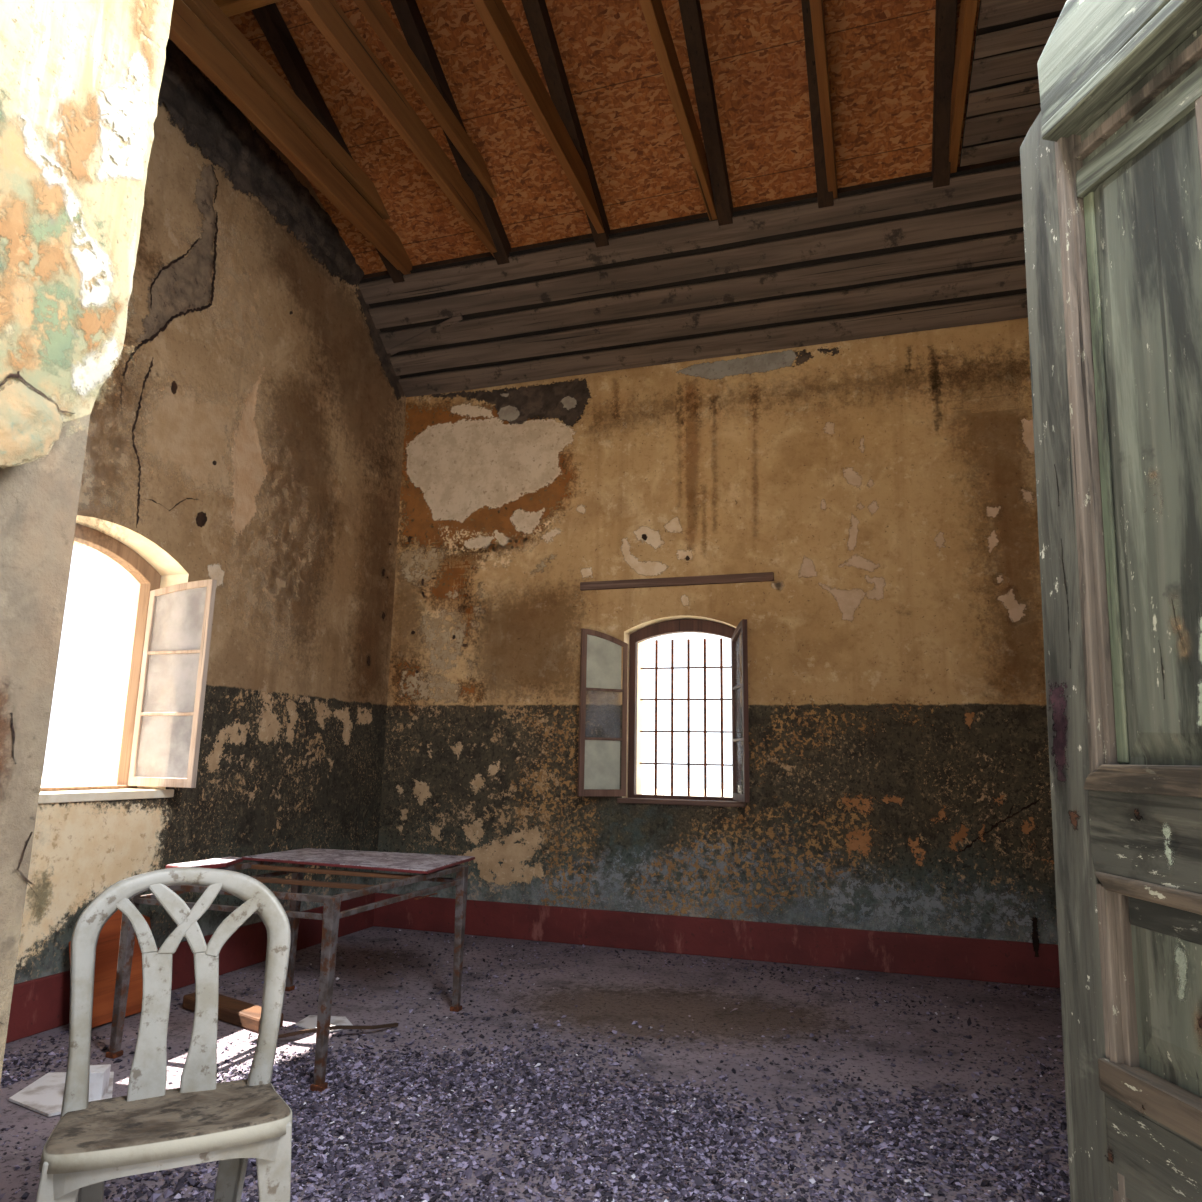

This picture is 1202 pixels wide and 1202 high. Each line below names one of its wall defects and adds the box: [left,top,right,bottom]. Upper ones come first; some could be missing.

peeling [0,0,404,427]
crack [0,371,76,414]
crack [121,165,219,527]
peeling [399,585,484,703]
flaking render [382,378,591,597]
peeling [620,517,693,576]
peeling [798,467,886,622]
peeling [986,505,1001,553]
peeling [996,575,1026,622]
crack [9,713,17,764]
crack [17,832,38,897]
damp [523,833,1049,944]